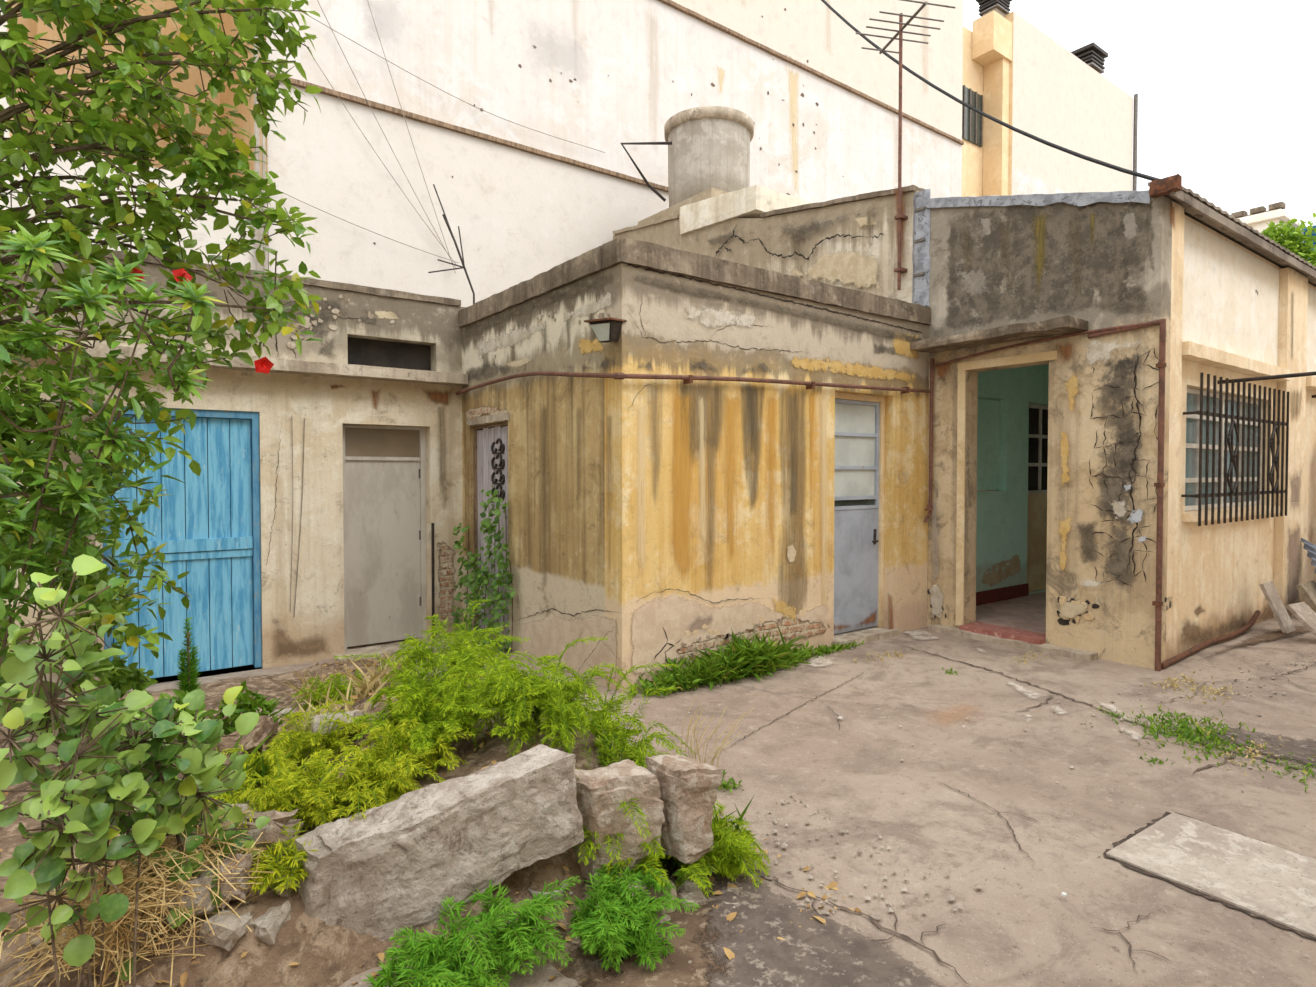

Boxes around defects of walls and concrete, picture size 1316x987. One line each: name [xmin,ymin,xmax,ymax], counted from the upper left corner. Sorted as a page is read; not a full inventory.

peeling [287,294,350,349]
crack [628,225,922,352]
peeling [791,333,919,383]
rust [896,189,904,264]
damp [947,202,1153,327]
damp [639,390,658,566]
damp [681,363,827,616]
crack [1089,344,1159,585]
crack [519,589,762,673]
peeling [521,595,831,679]
flaking render [1056,596,1100,625]
crack [724,640,1316,773]